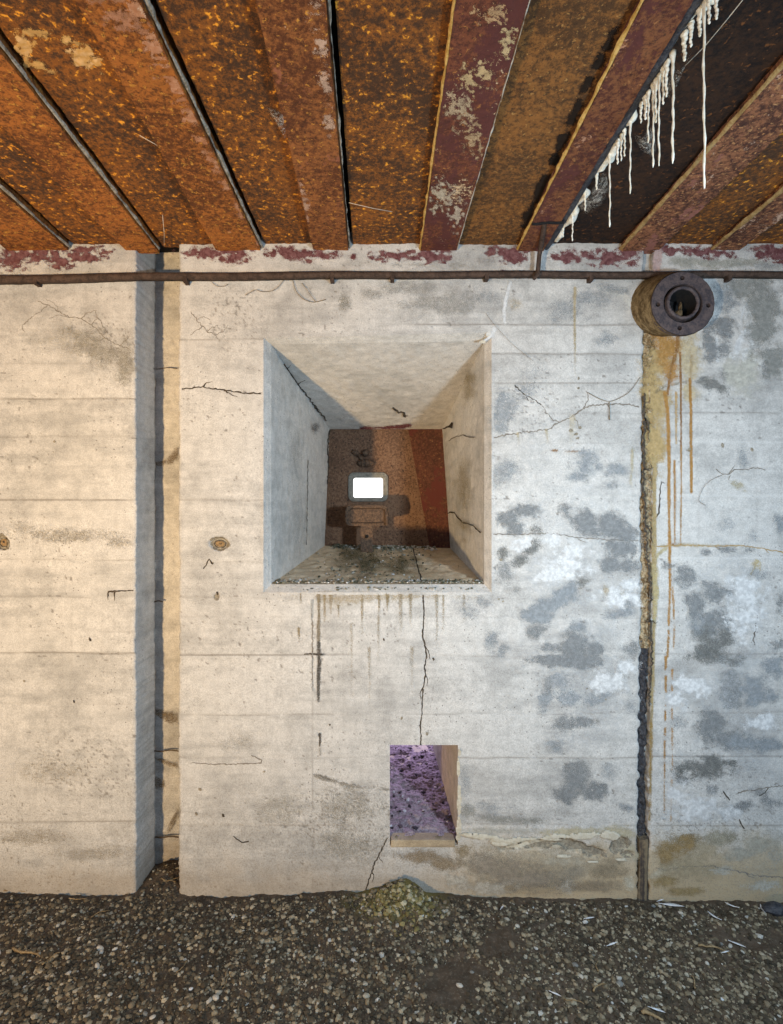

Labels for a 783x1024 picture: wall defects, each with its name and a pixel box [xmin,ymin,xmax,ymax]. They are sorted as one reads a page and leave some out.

efflorescence [597,142,621,173]
efflorescence [555,188,591,242]
peeling [0,244,116,275]
peeling [171,244,452,266]
peeling [546,243,783,272]
crack [182,381,260,397]
crack [443,385,783,707]
leakage [245,280,783,899]
corrosion [629,332,742,822]
crack [413,548,430,745]
spalling [390,747,644,867]
crack [365,835,390,890]